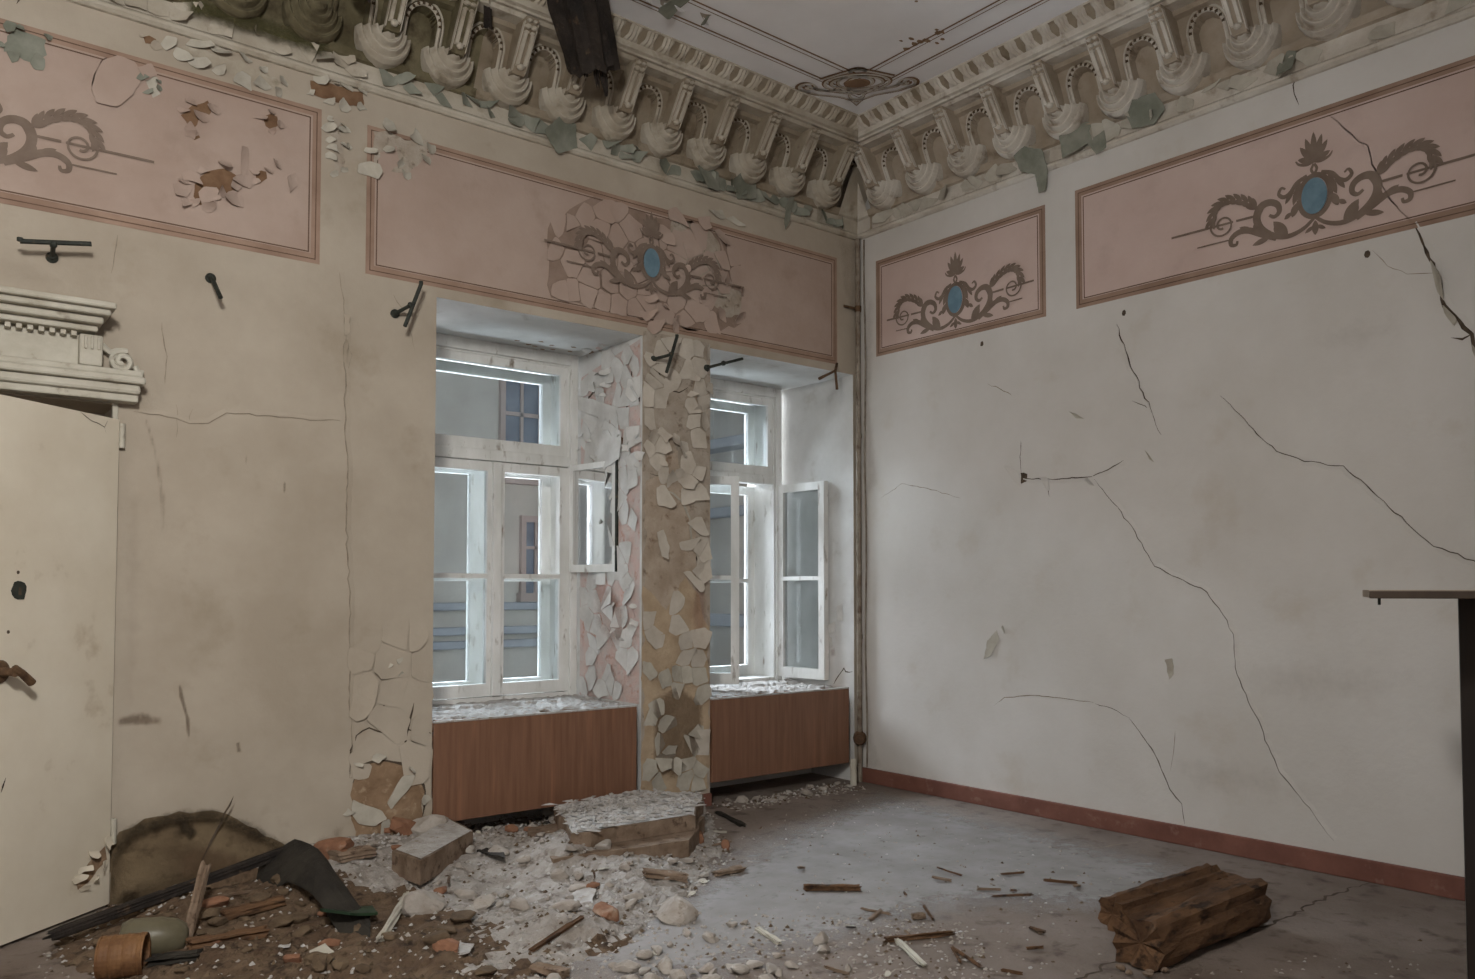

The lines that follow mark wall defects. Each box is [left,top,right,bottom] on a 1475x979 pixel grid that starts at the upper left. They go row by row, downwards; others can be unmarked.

peeling [178,146,282,213]
peeling [104,0,550,180]
peeling [1043,0,1475,164]
crack [1333,118,1475,356]
crack [1113,325,1161,434]
crack [82,273,430,778]
peeling [515,196,746,834]
crack [1218,396,1475,567]
peeling [343,613,434,836]
crack [995,452,1337,840]
peeling [72,836,114,892]